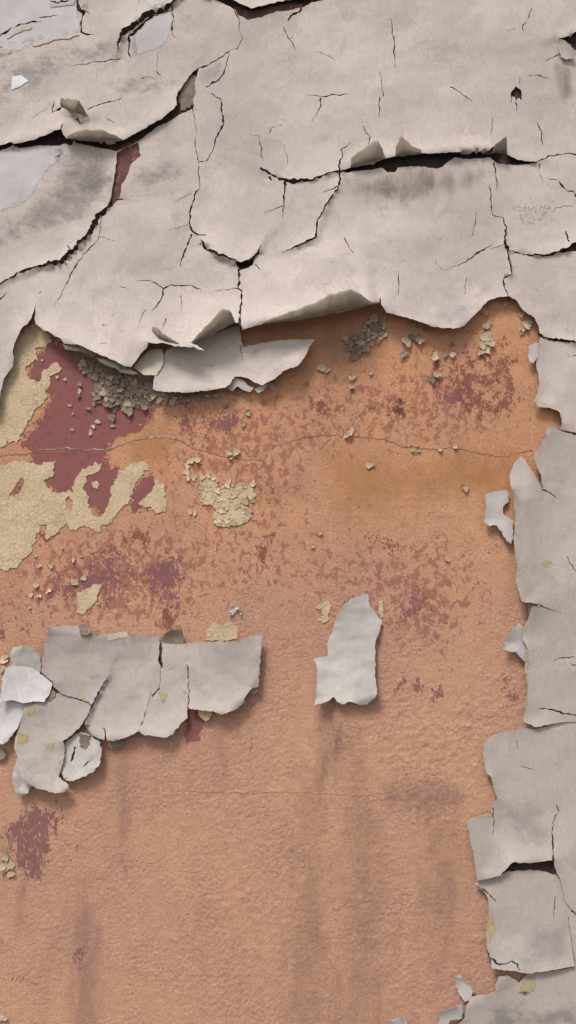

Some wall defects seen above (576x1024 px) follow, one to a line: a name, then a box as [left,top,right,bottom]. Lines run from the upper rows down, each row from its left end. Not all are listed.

peeling [0,0,80,50]
peeling [132,0,172,54]
peeling [0,98,122,211]
crack [0,0,335,326]
peeling [350,136,421,167]
crack [255,20,576,301]
peeling [483,136,507,155]
peeling [261,289,389,361]
peeling [21,309,314,527]
peeling [0,471,262,882]
peeling [314,593,382,705]
peeling [374,310,576,1024]